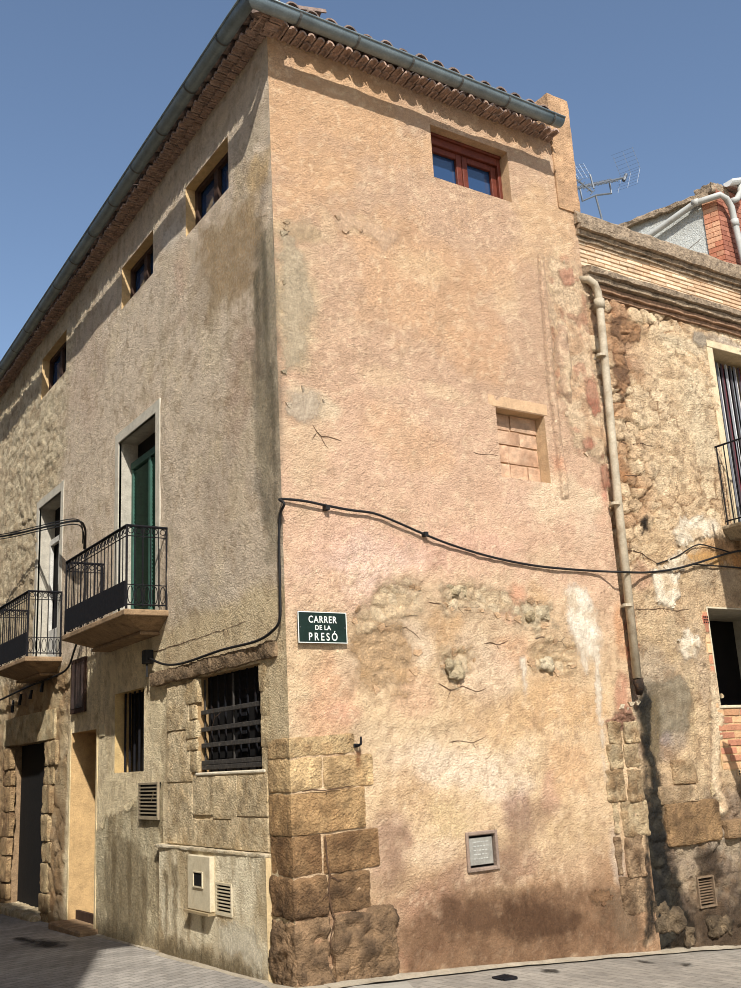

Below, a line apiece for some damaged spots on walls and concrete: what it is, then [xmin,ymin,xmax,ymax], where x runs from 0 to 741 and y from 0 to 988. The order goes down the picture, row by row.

spalling [611,314,641,399]
flaking render [348,577,424,697]
flaking render [439,645,476,687]
crack [438,683,486,699]
flaking render [440,581,577,677]
damp [564,586,604,744]
damp [402,685,741,972]